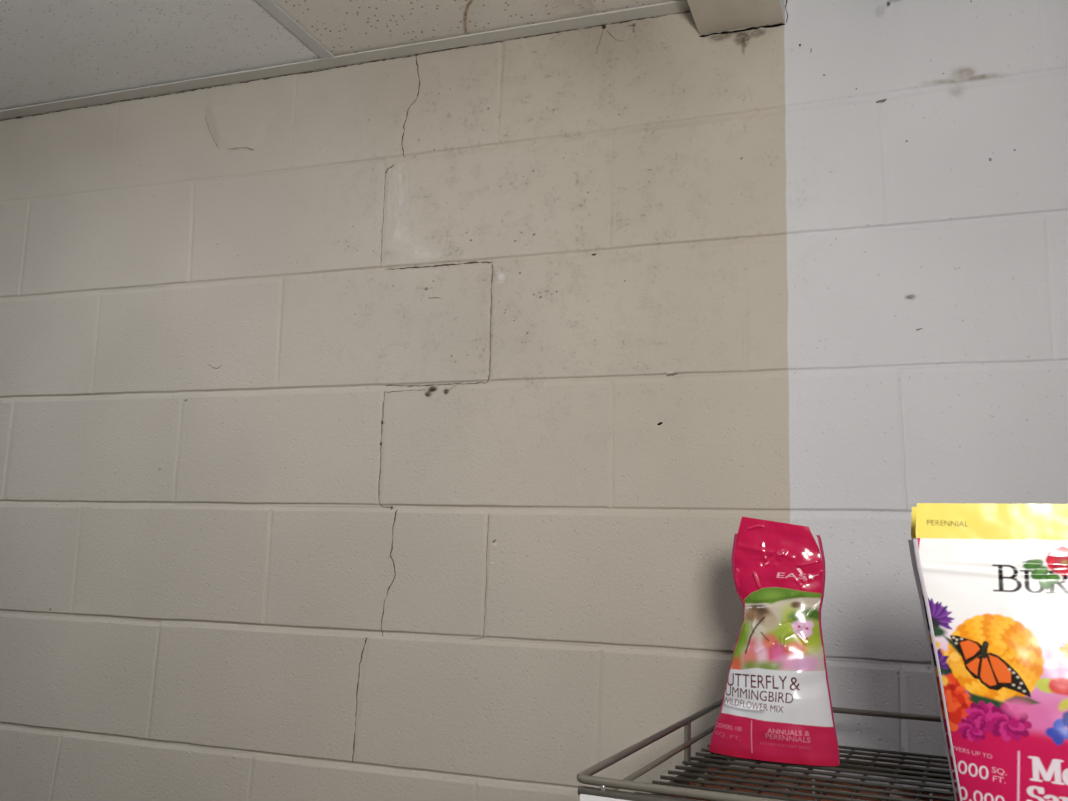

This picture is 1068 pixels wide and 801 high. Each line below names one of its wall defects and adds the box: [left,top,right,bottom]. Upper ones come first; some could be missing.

crack [0,0,788,156]
crack [352,261,493,762]